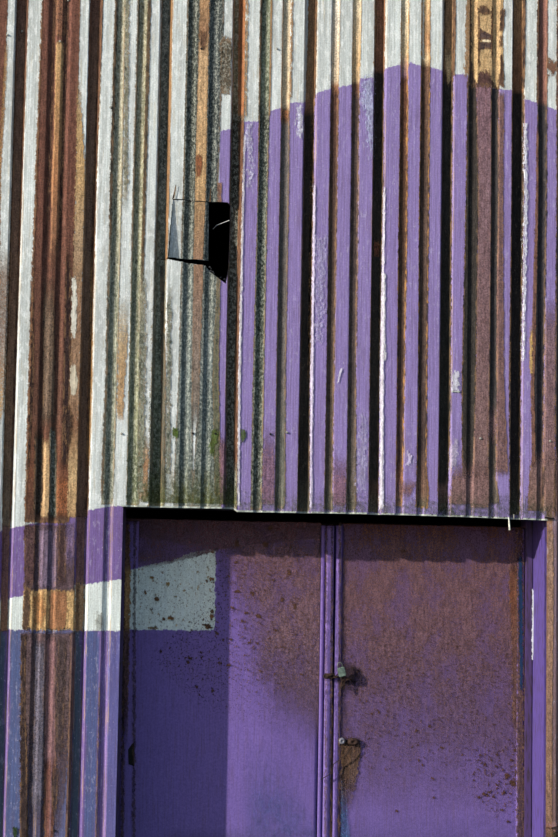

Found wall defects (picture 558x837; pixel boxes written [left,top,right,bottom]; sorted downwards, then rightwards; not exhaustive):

corrosion [0,0,29,632]
corrosion [19,0,103,837]
corrosion [191,264,203,425]
corrosion [195,0,210,201]
corrosion [218,0,249,510]
corrosion [262,0,295,509]
corrosion [297,0,317,512]
corrosion [323,0,362,511]
corrosion [368,0,386,512]
corrosion [395,0,558,518]
corrosion [120,518,526,837]
corrosion [546,530,558,837]